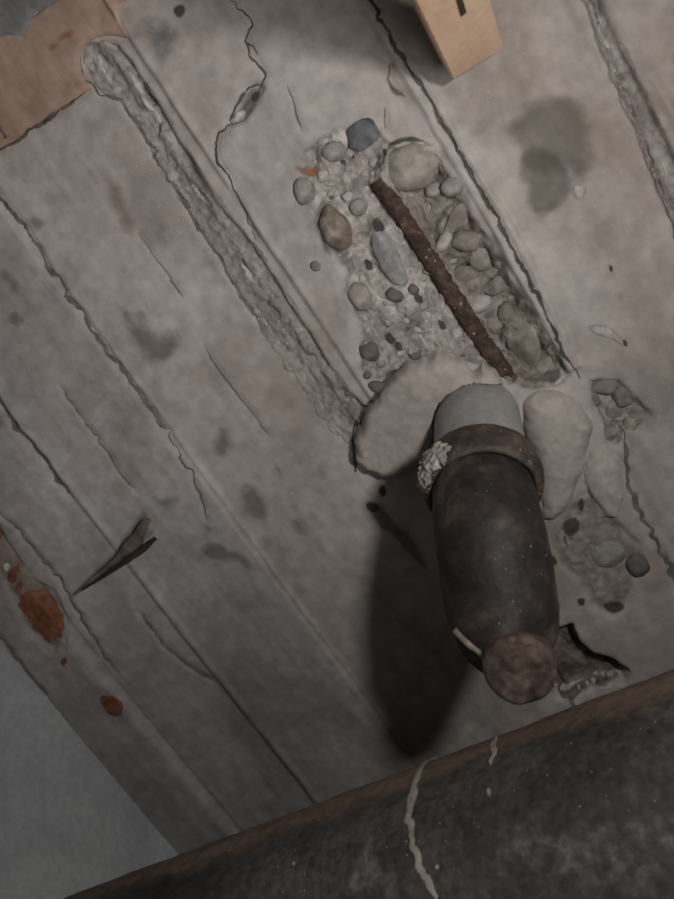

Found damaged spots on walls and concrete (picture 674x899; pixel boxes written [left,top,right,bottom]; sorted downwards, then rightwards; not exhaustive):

crack [215,0,267,240]
crack [288,87,302,129]
spalling [293,118,570,394]
crack [622,428,674,580]